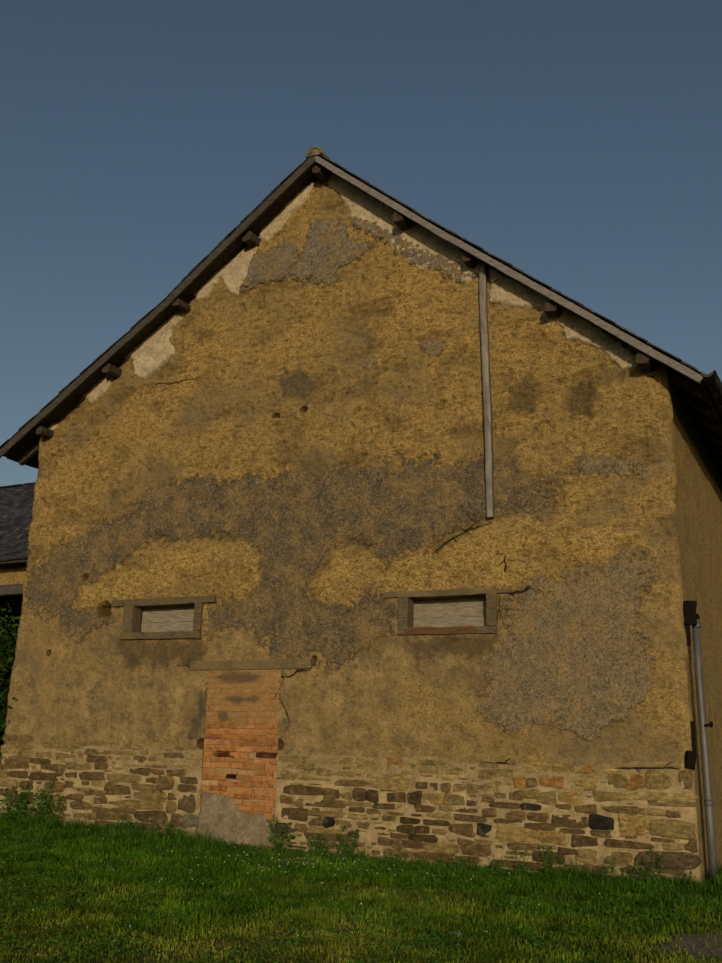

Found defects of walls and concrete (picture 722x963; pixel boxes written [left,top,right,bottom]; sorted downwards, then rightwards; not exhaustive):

flaking render [194,172,639,371]
flaking render [125,309,185,380]
flaking render [82,375,114,404]
crack [431,522,492,554]
flaking render [24,448,661,741]
crack [274,669,310,732]